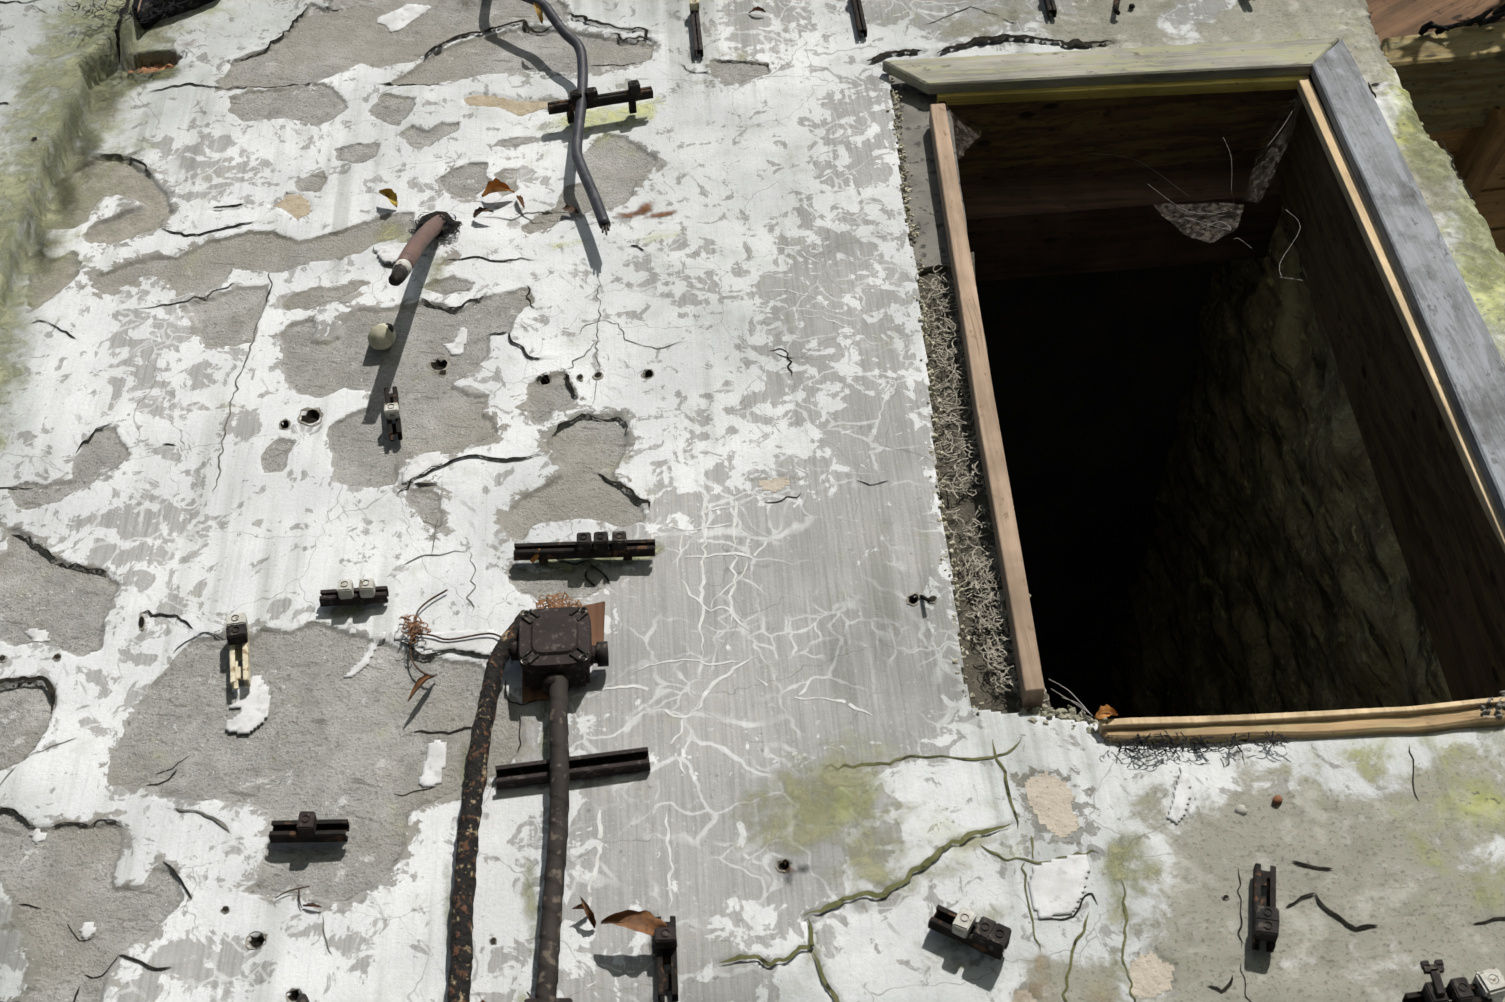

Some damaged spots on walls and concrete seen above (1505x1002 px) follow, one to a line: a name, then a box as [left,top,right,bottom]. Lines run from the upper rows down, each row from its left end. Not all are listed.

flaking render [224,0,651,147]
crack [867,6,1110,61]
damp [0,0,179,400]
flaking render [50,160,171,244]
damp [1410,112,1505,283]
flaking render [282,254,532,529]
flaking render [504,375,643,539]
flaking render [0,532,116,655]
flaking render [0,682,55,769]
flaking render [112,626,522,901]
flaking render [0,814,180,1002]
crack [719,735,1136,1002]